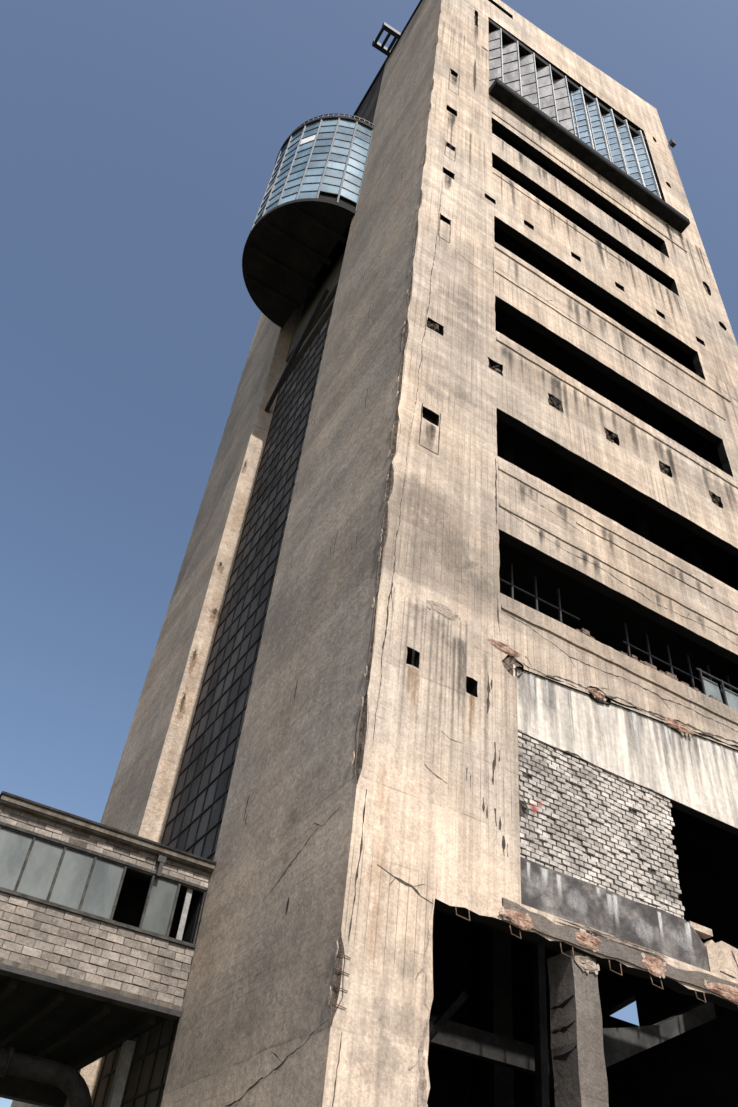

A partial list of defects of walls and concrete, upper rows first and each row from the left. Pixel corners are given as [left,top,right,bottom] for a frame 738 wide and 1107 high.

crack [372,166,595,746]
spalling [488,638,738,744]
crack [261,789,433,939]
spalling [328,936,351,1023]
spalling [498,906,533,930]
spalling [555,917,668,978]
spalling [704,951,738,1002]
crack [225,1021,342,1107]